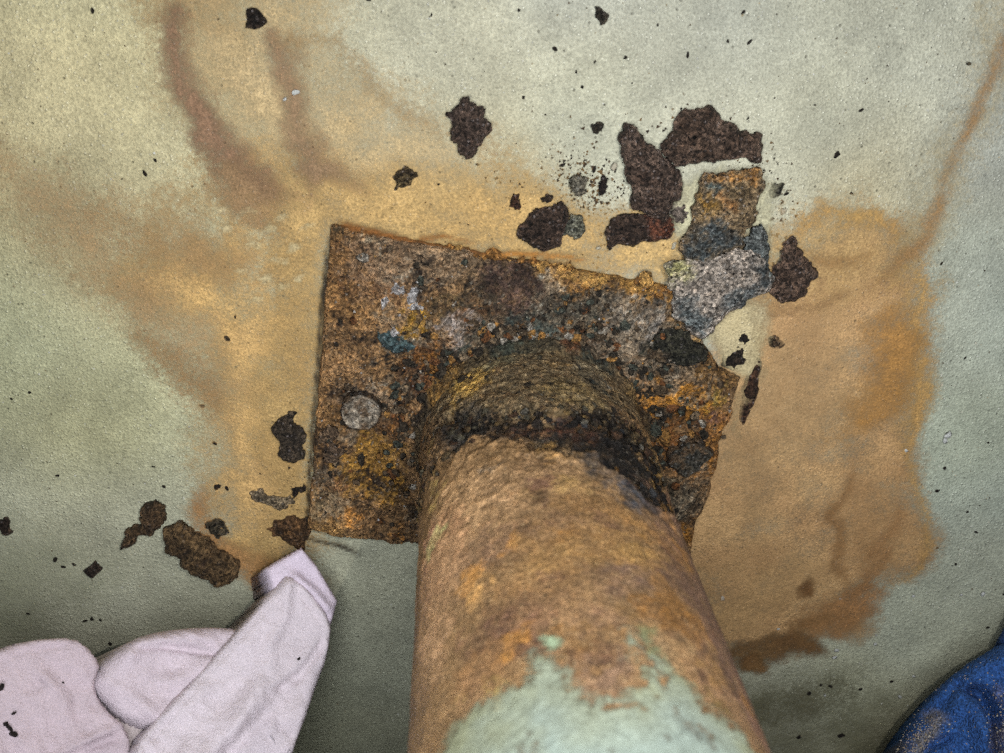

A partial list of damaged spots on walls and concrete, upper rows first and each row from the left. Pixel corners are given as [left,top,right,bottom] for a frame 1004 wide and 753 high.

rust [116,0,942,673]
peeling [663,179,775,400]